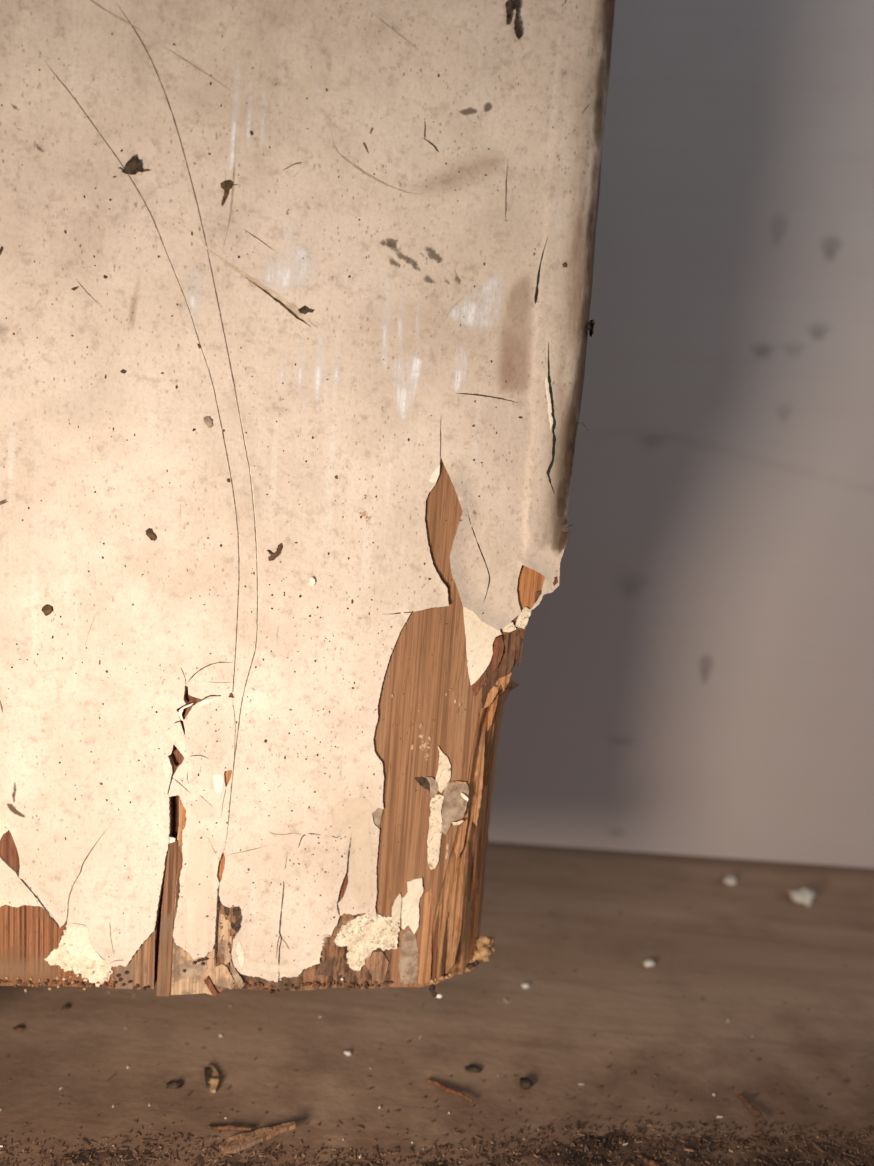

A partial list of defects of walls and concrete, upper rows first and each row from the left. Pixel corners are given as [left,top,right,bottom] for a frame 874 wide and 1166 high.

crack [545,343,556,494]
crack [47,4,352,982]
peeling [164,690,234,779]
peeling [213,457,560,994]
peeling [0,817,20,872]
peeling [0,899,115,993]
crack [16,833,125,963]